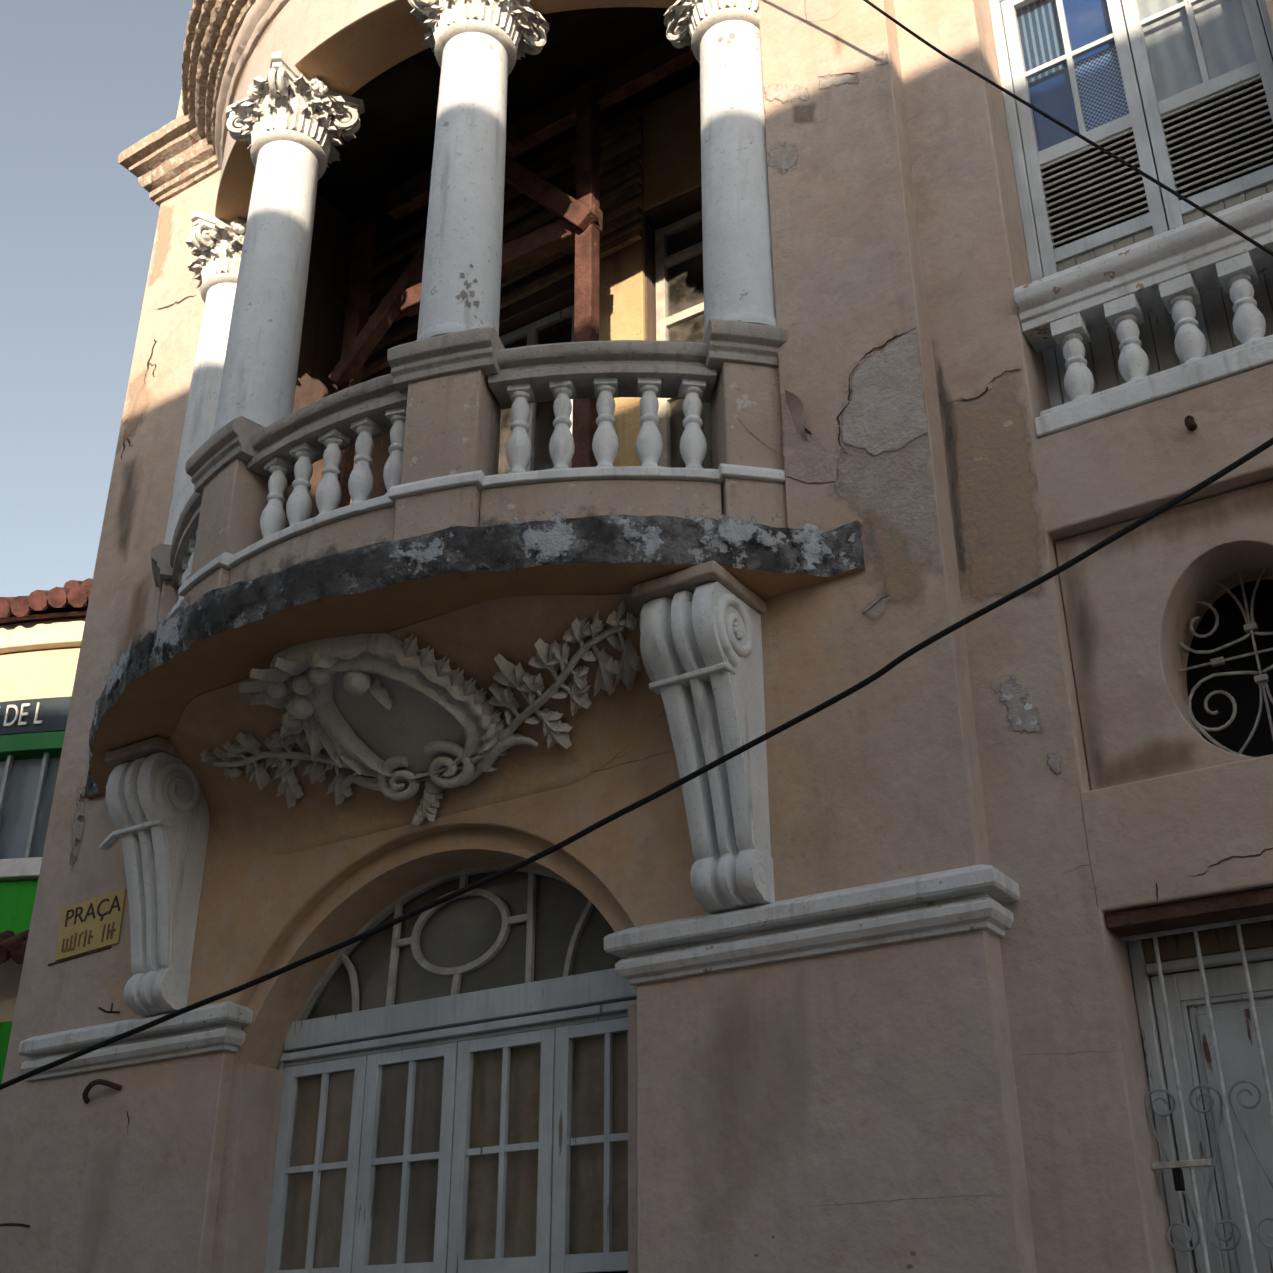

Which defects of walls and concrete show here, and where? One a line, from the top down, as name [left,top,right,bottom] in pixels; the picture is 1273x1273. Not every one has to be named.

crack [144,295,196,383]
crack [120,420,132,460]
peeling [781,327,937,571]
damp [278,545,389,603]
crack [1188,848,1273,877]